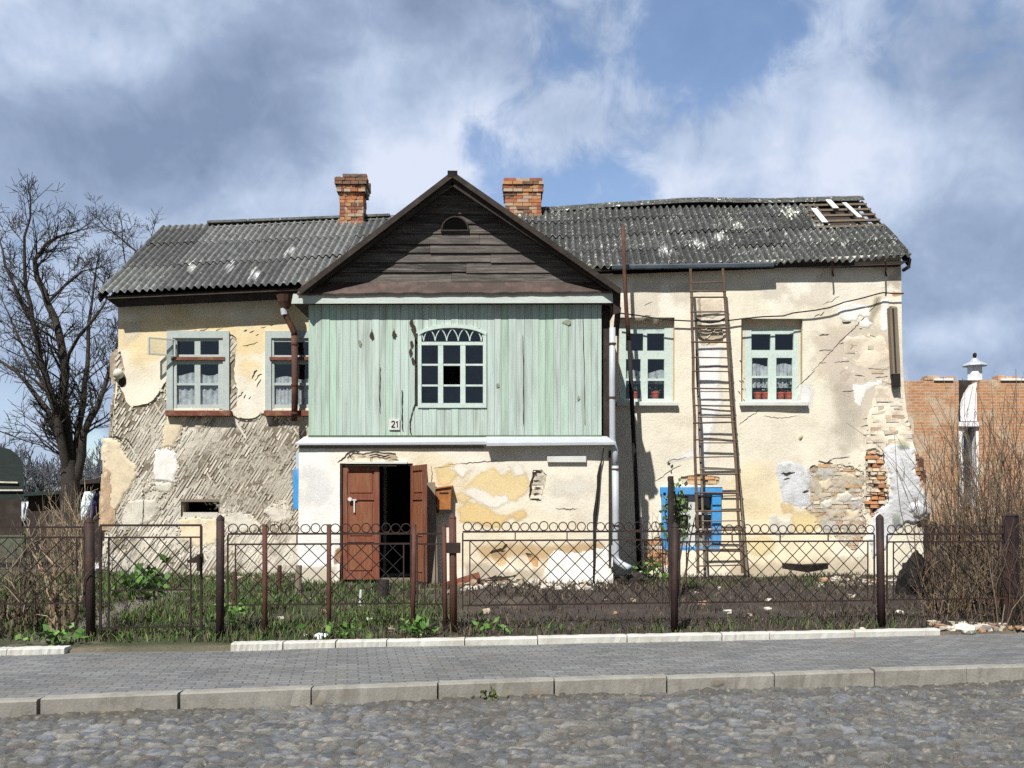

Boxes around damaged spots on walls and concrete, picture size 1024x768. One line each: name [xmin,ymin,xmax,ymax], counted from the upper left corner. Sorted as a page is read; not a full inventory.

crack [798,296,878,386]
peeling [99,417,187,530]
peeling [178,503,291,549]
peeling [462,487,509,508]
flaking render [509,464,547,502]
flaking render [781,328,926,558]